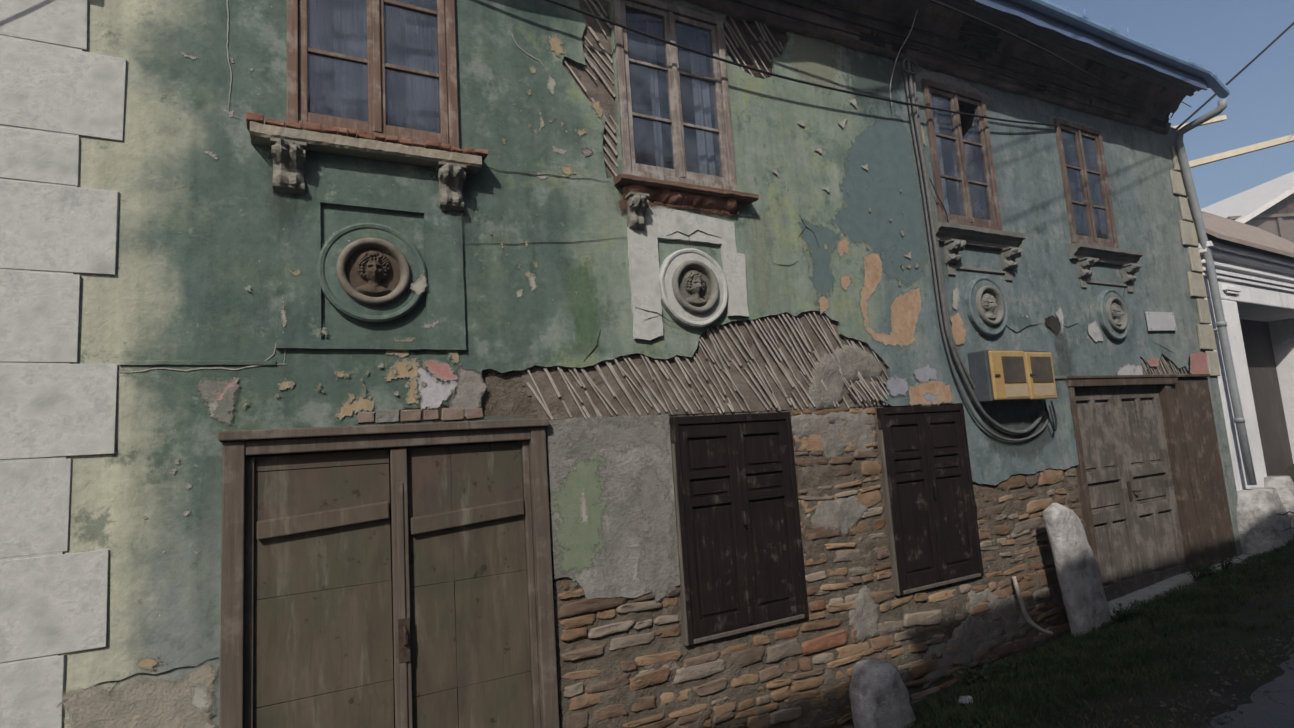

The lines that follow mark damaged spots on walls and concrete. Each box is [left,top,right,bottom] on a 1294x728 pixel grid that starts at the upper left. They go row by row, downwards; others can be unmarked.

peeling [795,98,930,348]
peeling [195,377,249,424]
spalling [274,379,295,398]
flaking render [316,320,487,425]
peeling [545,414,680,602]
spalling [59,654,217,728]
crack [84,657,219,693]